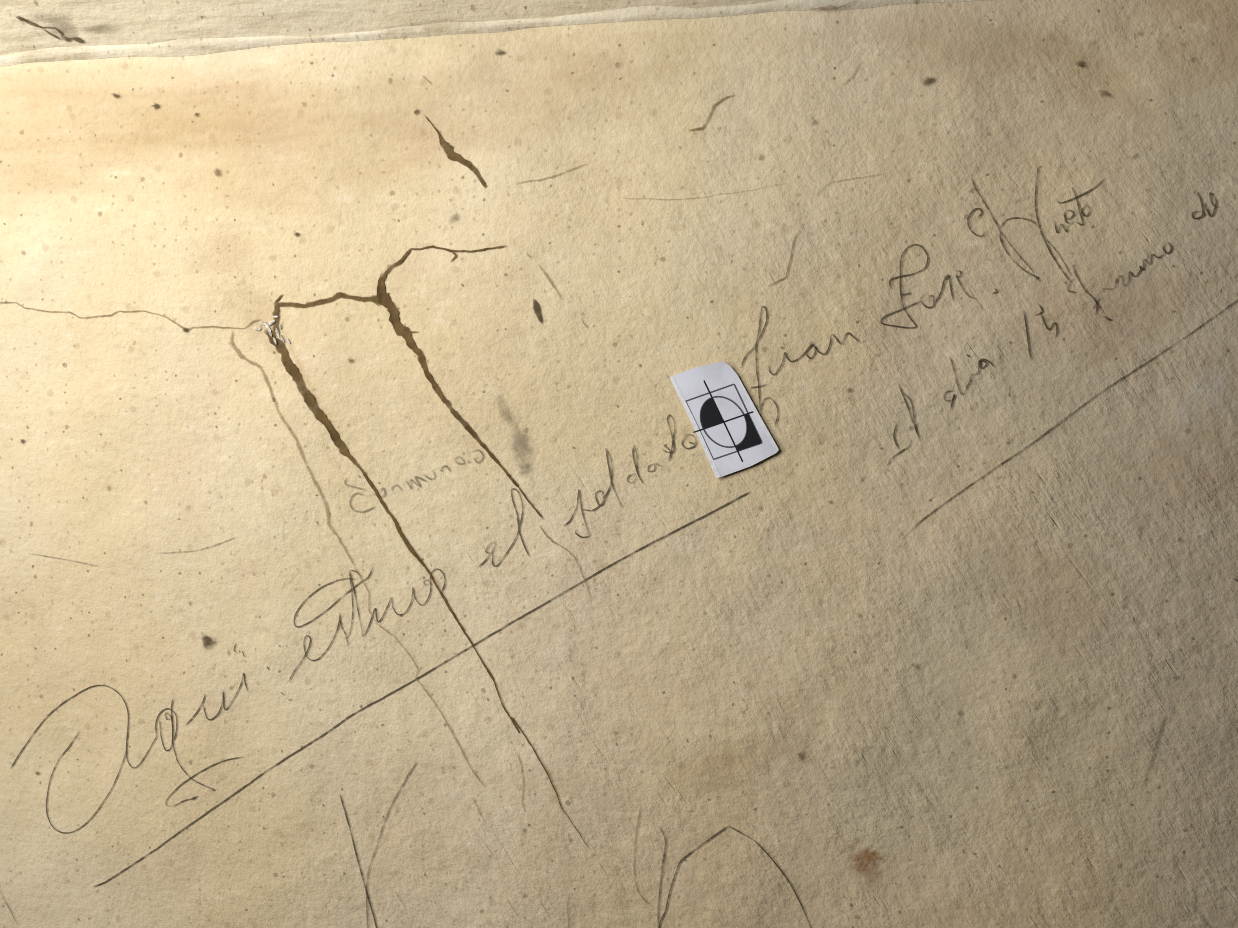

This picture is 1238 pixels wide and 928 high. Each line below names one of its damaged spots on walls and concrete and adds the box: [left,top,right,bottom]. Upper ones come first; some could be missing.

crack [425,116,486,188]
crack [0,245,590,847]